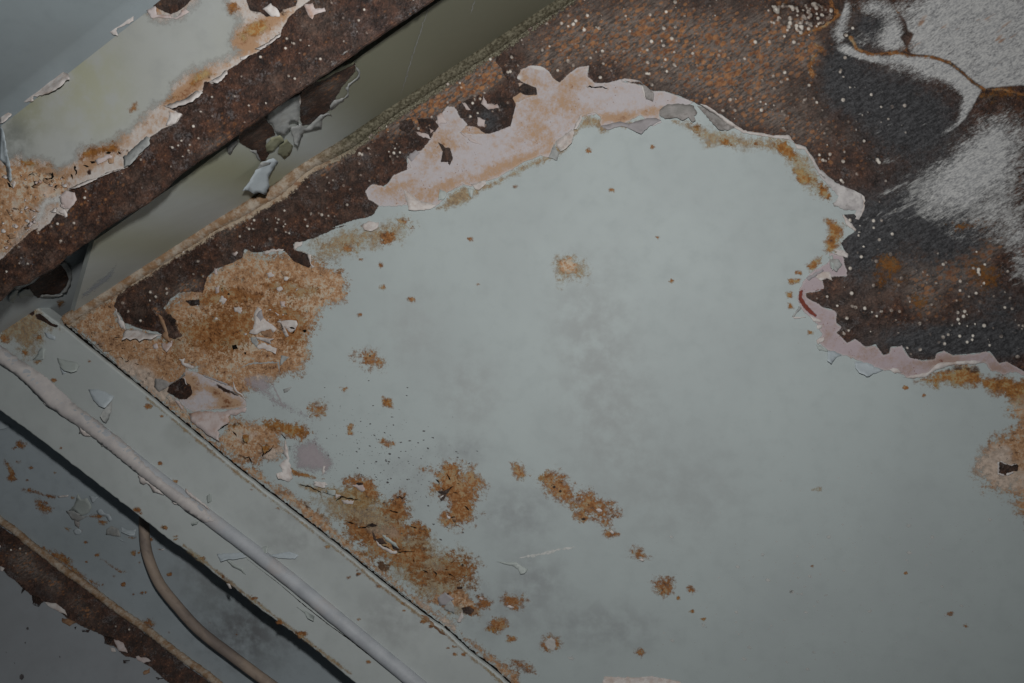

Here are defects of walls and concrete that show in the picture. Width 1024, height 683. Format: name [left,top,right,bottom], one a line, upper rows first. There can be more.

peeling [0,0,326,259]
rust [0,0,428,307]
rust [71,0,1024,455]
peeling [366,65,865,231]
peeling [792,249,1024,379]
peeling [0,345,214,526]
rust [162,526,351,674]
rust [219,415,486,600]
rust [447,638,533,683]
rust [538,471,621,537]
rust [651,576,695,600]
rust [920,365,1024,515]